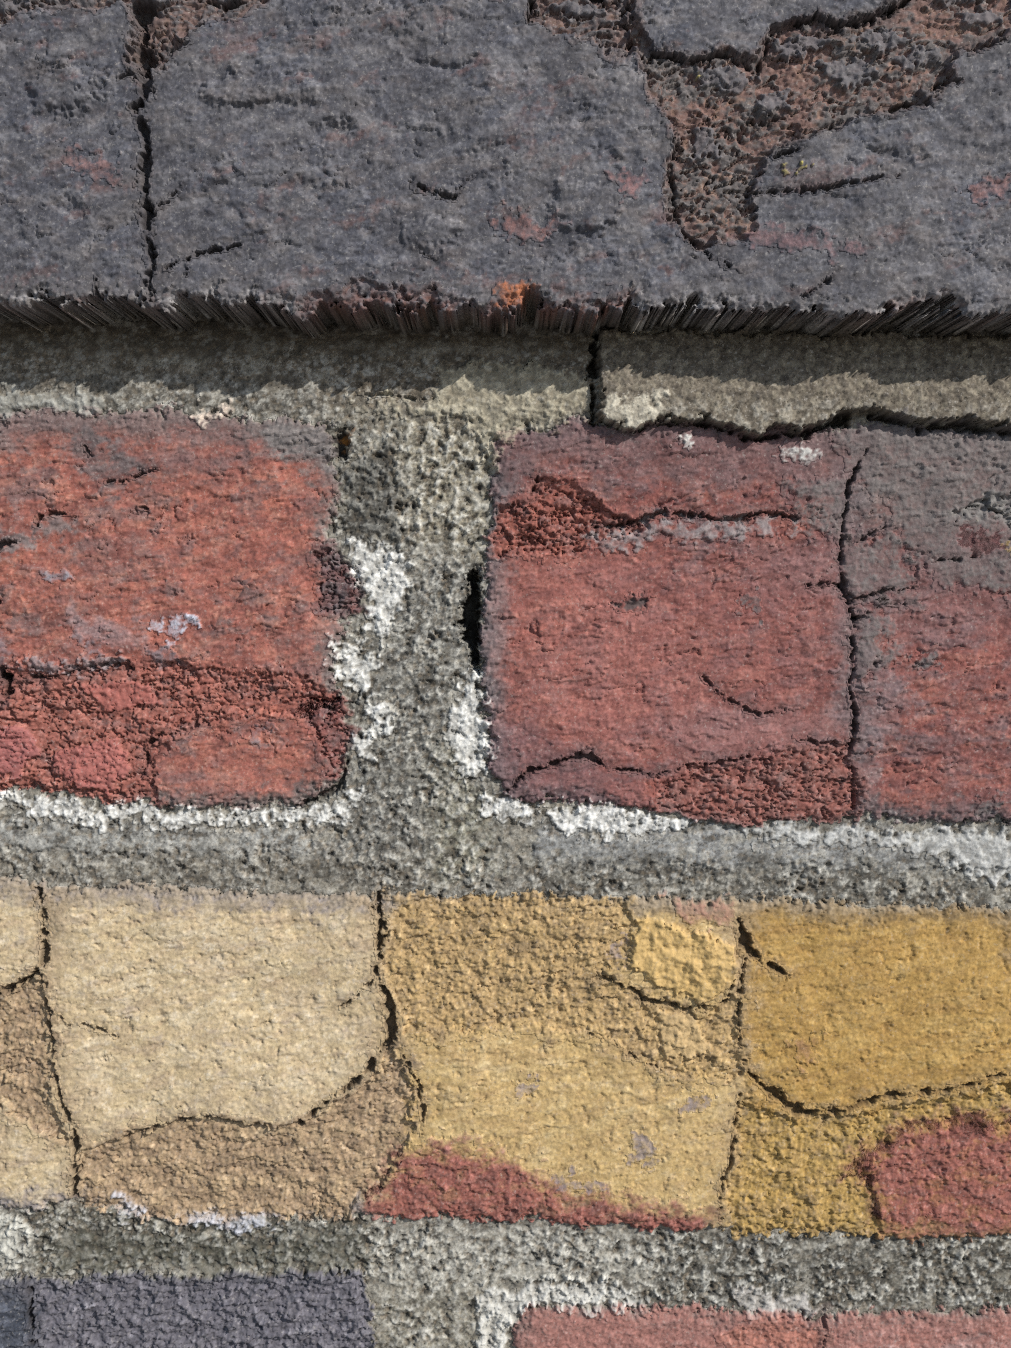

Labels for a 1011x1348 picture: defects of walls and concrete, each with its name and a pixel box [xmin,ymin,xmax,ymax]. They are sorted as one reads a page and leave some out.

spalling [0,0,271,75]
crack [92,0,244,320]
crack [198,0,258,14]
spalling [523,0,1011,252]
crack [0,508,78,553]
crack [80,443,160,513]
water stain [0,288,670,763]
spalling [481,467,653,571]
crack [504,302,1011,817]
crack [0,884,428,1201]
crack [587,916,1008,1222]